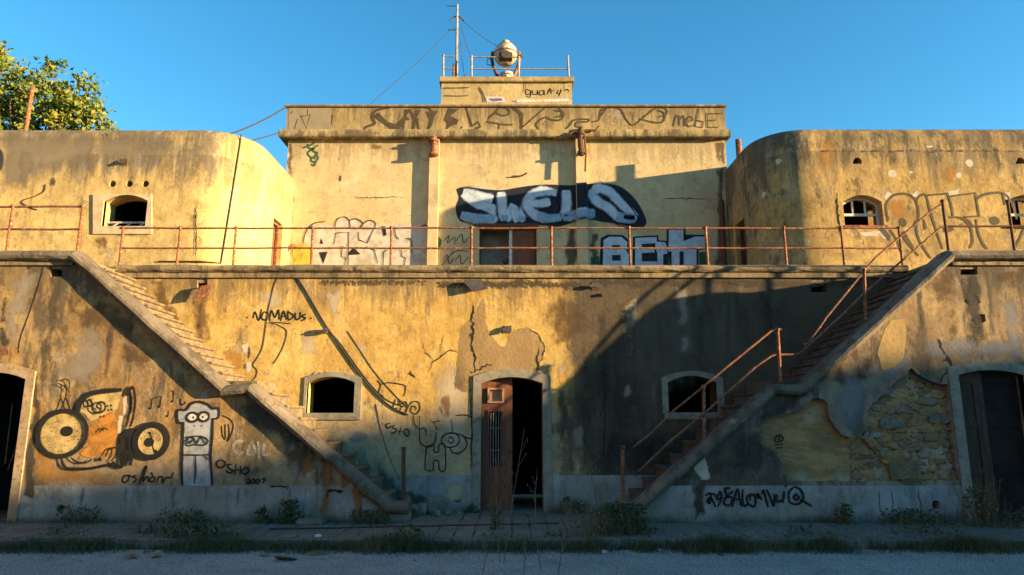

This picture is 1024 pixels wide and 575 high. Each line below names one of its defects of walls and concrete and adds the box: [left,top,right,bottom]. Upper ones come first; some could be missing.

damp [42,279,59,378]
damp [70,287,132,375]
flaking render [319,279,468,314]
crack [408,304,491,470]
flaking render [436,278,860,457]
flaking render [758,355,955,482]
peeling [925,300,1022,359]